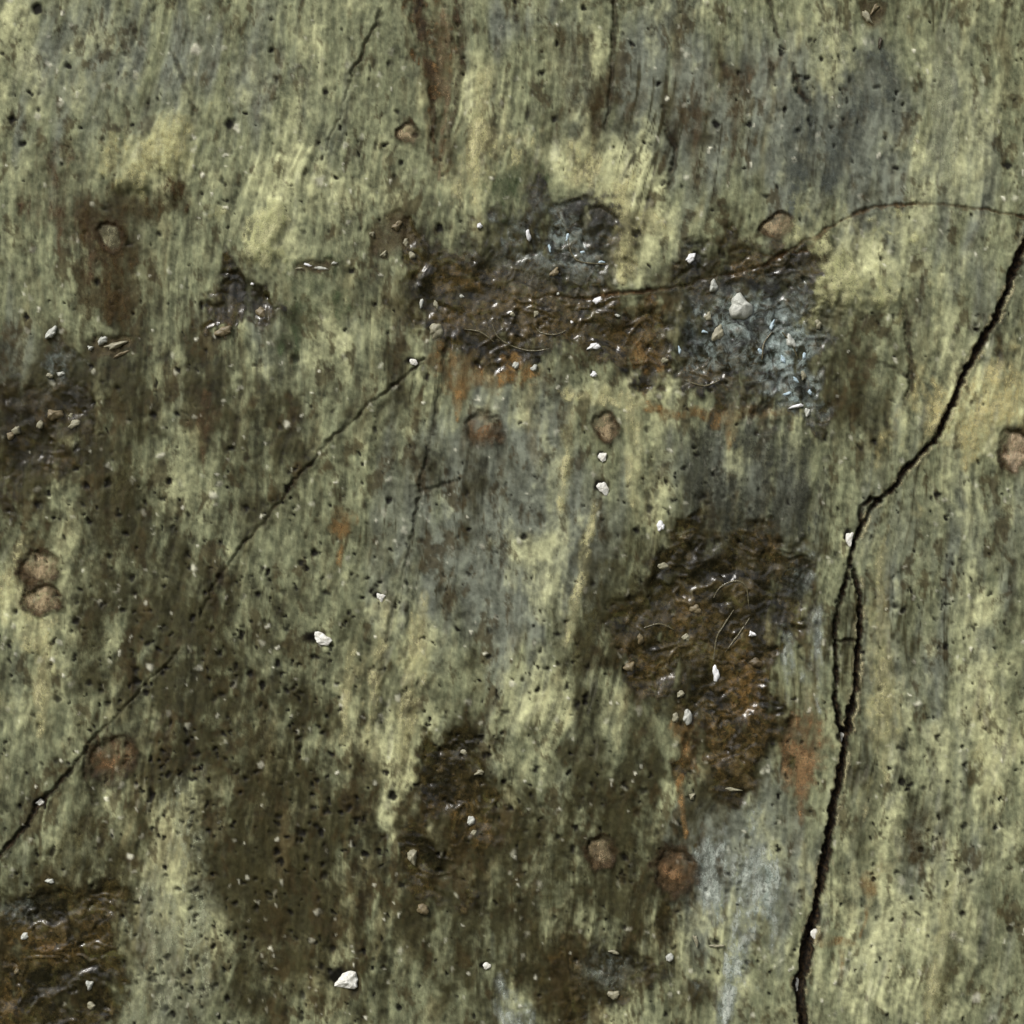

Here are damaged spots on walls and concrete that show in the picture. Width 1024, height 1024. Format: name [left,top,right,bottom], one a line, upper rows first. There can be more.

spalling [200,246,287,338]
spalling [369,172,838,437]
crack [595,289,655,298]
crack [764,203,924,266]
crack [269,433,336,517]
spalling [605,508,815,808]
crack [790,208,1024,1024]
crack [0,733,98,858]